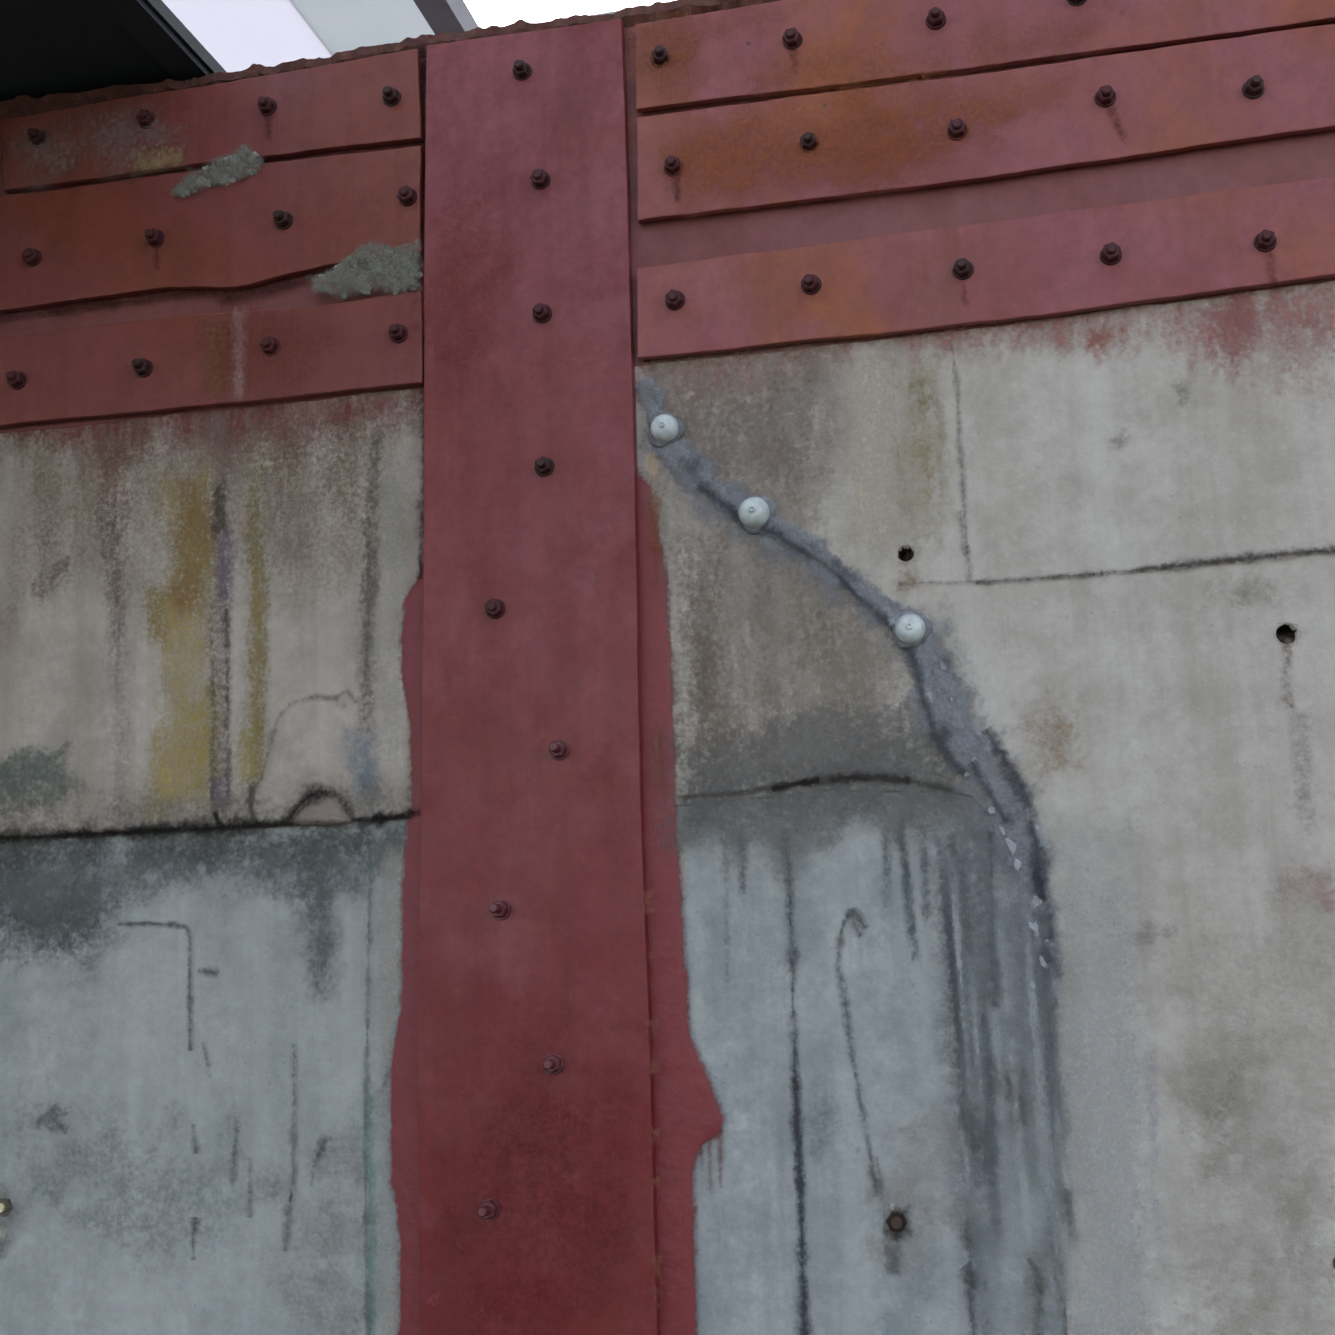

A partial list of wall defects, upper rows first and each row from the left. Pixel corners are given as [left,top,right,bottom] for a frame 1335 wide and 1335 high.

leakage [210,463,231,808]
leakage [362,461,400,719]
leakage [0,824,405,1061]
crack [634,376,1067,1335]
leakage [668,599,1155,1335]